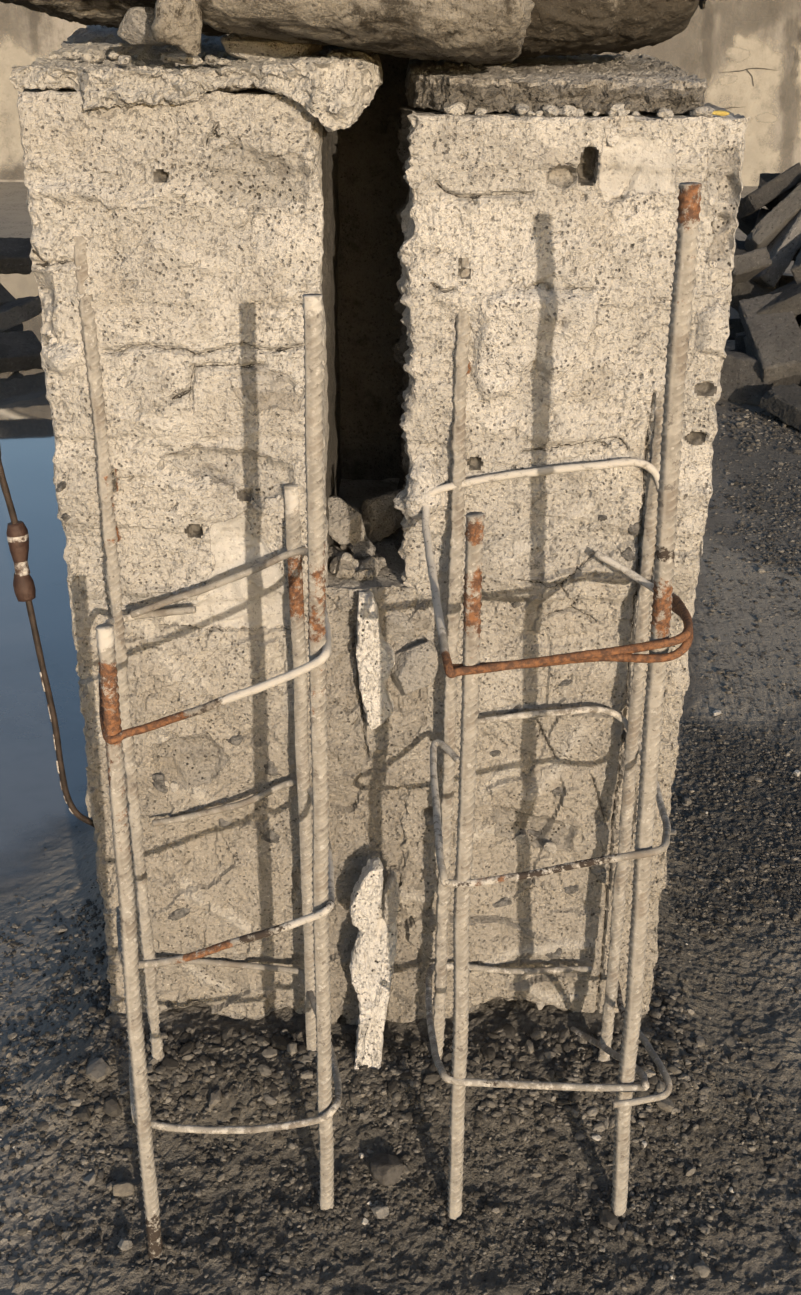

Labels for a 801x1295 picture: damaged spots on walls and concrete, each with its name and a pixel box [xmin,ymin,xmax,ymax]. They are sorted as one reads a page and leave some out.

crack [105,342,293,400]
crack [519,394,654,1011]